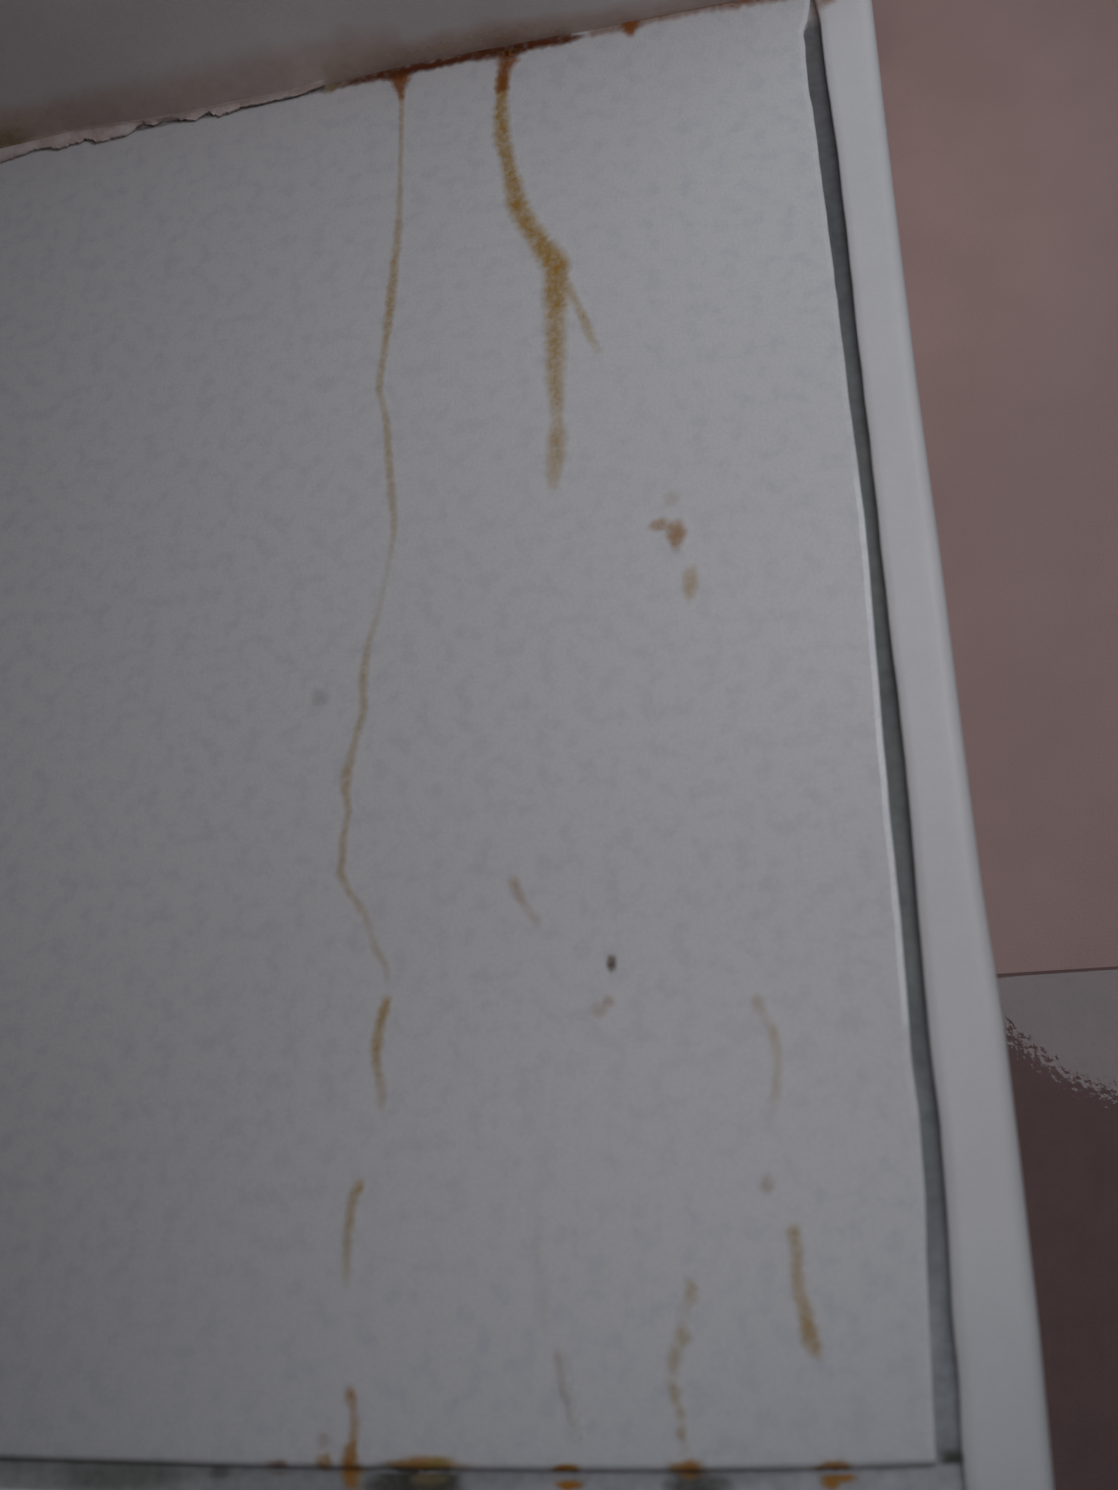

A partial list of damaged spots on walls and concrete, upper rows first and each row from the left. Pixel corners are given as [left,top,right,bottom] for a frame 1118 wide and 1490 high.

corrosion [392,74,408,98]
corrosion [495,50,567,396]
corrosion [661,522,684,545]
corrosion [319,1440,360,1487]
corrosion [554,1465,582,1490]
corrosion [818,1462,854,1489]